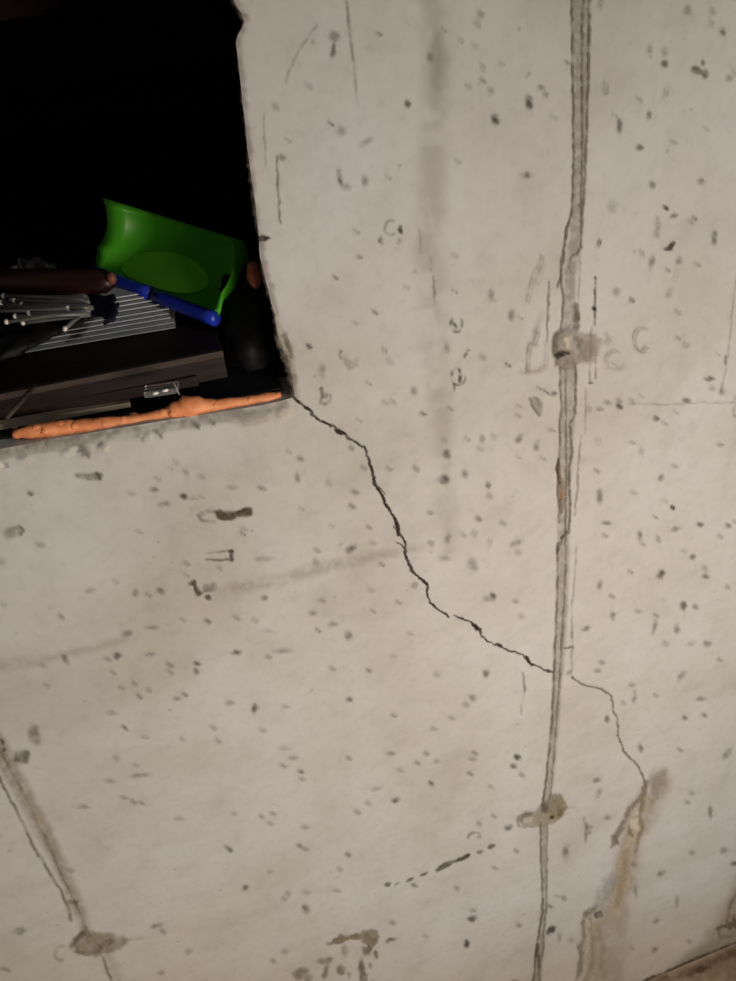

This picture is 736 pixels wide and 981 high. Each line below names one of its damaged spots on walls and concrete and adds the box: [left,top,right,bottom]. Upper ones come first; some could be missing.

crack [293,396,646,786]
water stain [577,777,662,976]